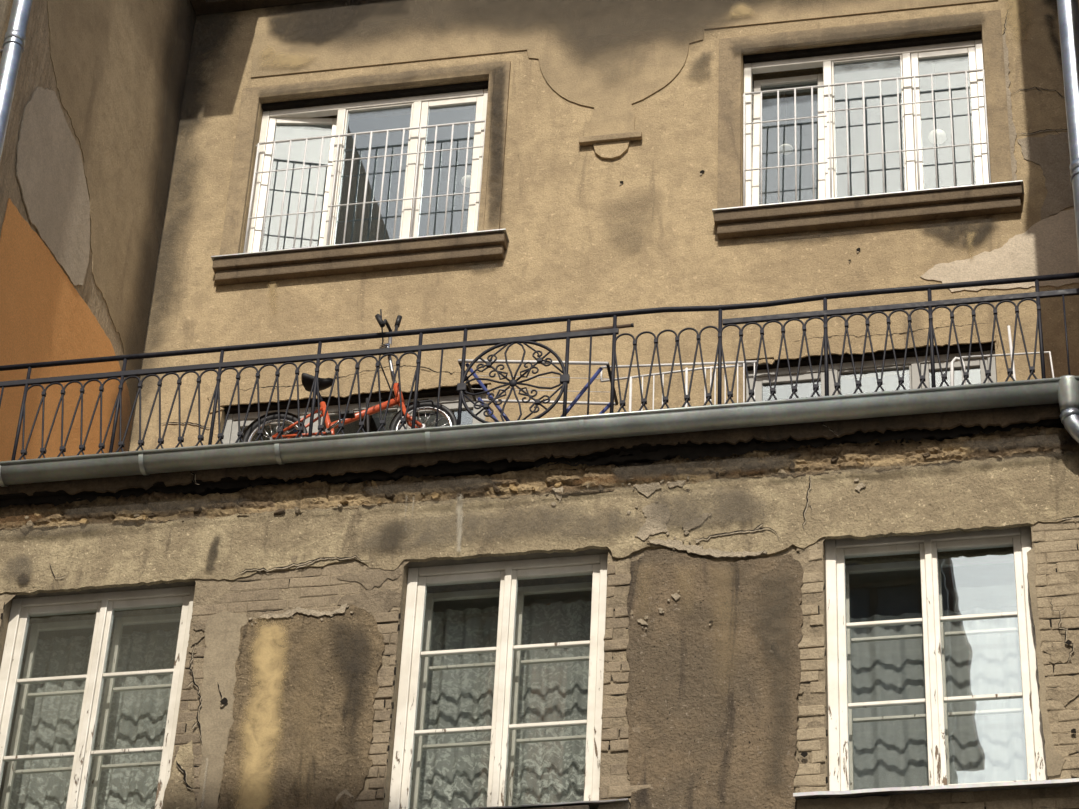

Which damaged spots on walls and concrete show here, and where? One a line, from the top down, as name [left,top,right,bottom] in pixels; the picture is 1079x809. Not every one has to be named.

damp [1046,0,1061,57]
spalling [0,423,1079,558]
spalling [0,593,18,628]
crack [176,761,193,790]
crack [188,644,223,744]
damp [237,625,286,809]
spalling [170,546,411,809]
spalling [886,516,1079,809]